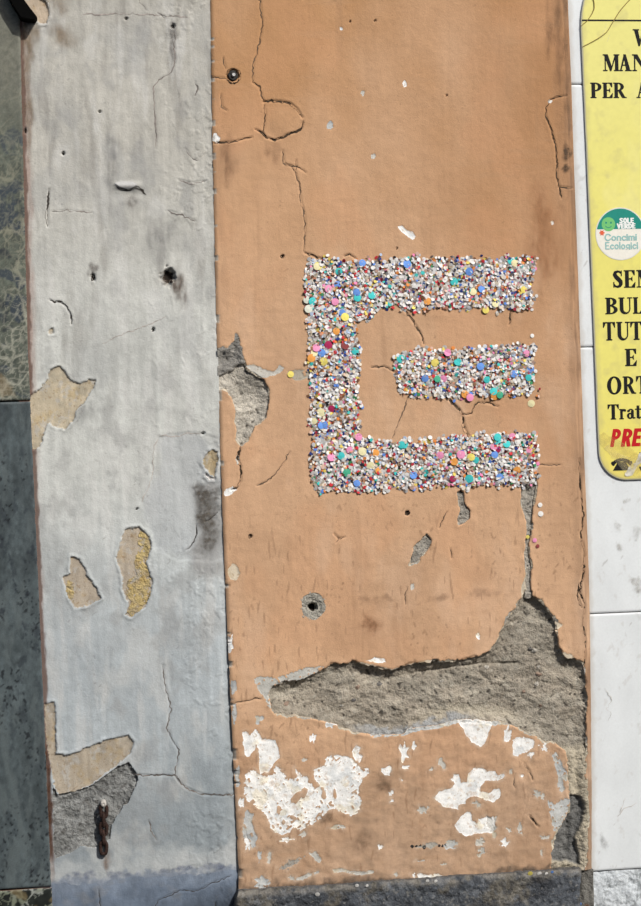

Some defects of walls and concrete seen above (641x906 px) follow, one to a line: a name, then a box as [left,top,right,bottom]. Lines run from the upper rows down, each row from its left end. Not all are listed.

crack [215,0,318,259]
crack [545,95,571,198]
peeling [29,366,96,449]
spalling [217,333,310,465]
crack [445,396,498,434]
peeling [63,557,100,608]
peeling [116,527,153,617]
peeling [228,563,240,581]
spalling [231,478,590,880]
spalling [44,702,138,857]
crack [135,669,234,796]
peeling [254,875,271,888]